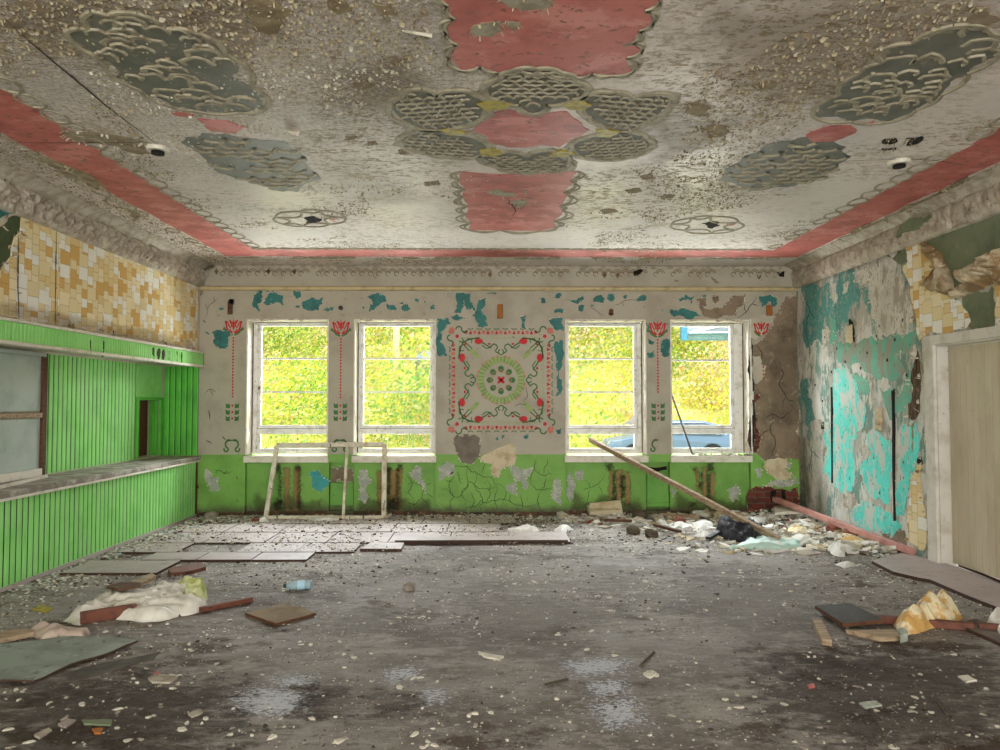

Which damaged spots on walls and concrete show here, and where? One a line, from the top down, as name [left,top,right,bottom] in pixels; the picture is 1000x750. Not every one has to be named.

peeling [580,0,1000,278]
peeling [0,142,234,264]
peeling [294,173,528,220]
peeling [926,214,1000,330]
peeling [360,292,497,356]
crack [748,338,794,454]
flaking render [646,249,923,545]
flaking render [204,468,220,491]
flaking render [309,466,372,504]
crack [408,459,550,512]
flaking render [438,433,533,496]